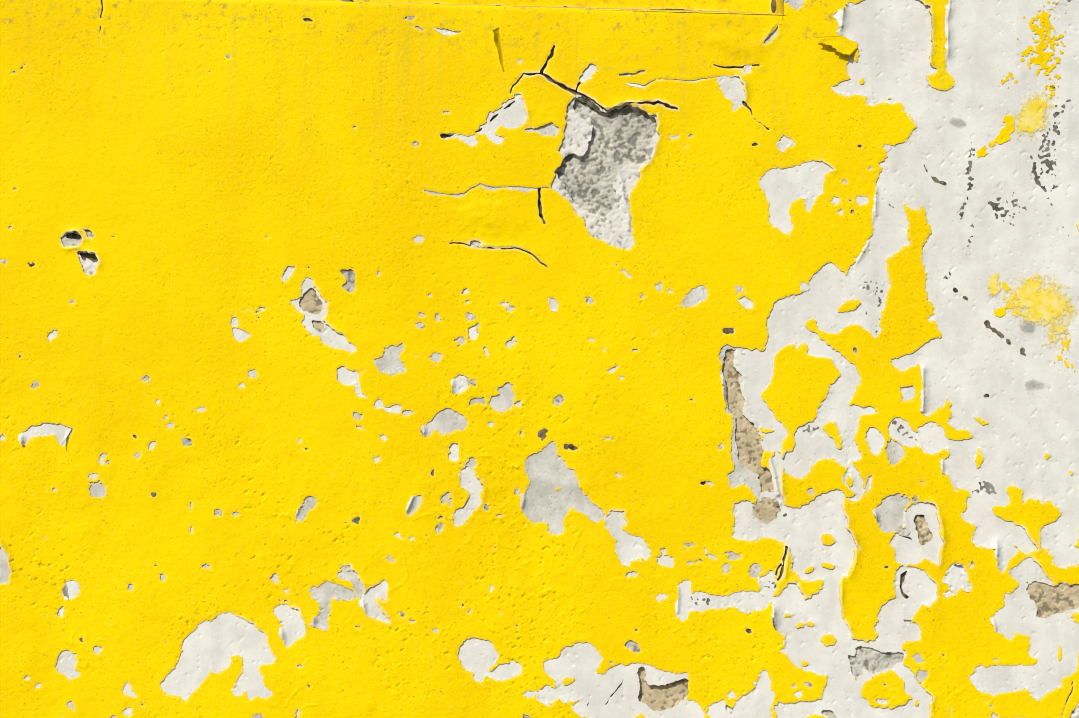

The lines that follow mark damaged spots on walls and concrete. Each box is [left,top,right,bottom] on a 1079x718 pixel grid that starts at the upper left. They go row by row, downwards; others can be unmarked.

crack [510,46,759,115]
spalling [440,64,693,250]
crack [424,183,549,224]
crack [449,240,547,267]
spalling [281,266,356,353]
peeling [337,366,413,416]
peeling [372,343,406,377]
peeling [514,0,1079,718]
peeling [420,374,521,534]
peeling [270,565,415,648]
peeling [160,612,275,701]
peeling [458,637,522,683]